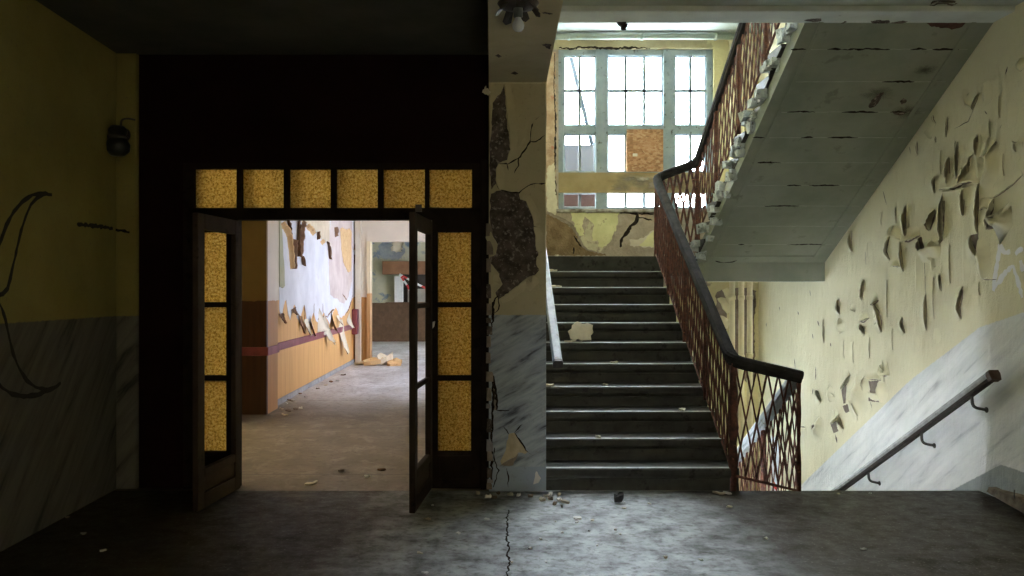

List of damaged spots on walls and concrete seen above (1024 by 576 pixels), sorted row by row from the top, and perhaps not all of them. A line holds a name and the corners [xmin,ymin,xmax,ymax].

spalling [759,18,822,74]
peeling [279,221,355,354]
crack [496,113,545,193]
flaking render [482,44,650,489]
crack [620,213,653,247]
peeling [629,230,654,248]
spalling [690,88,768,260]
peeling [812,279,905,346]
peeling [865,88,1023,331]
peeling [795,359,890,444]
crack [504,510,512,576]